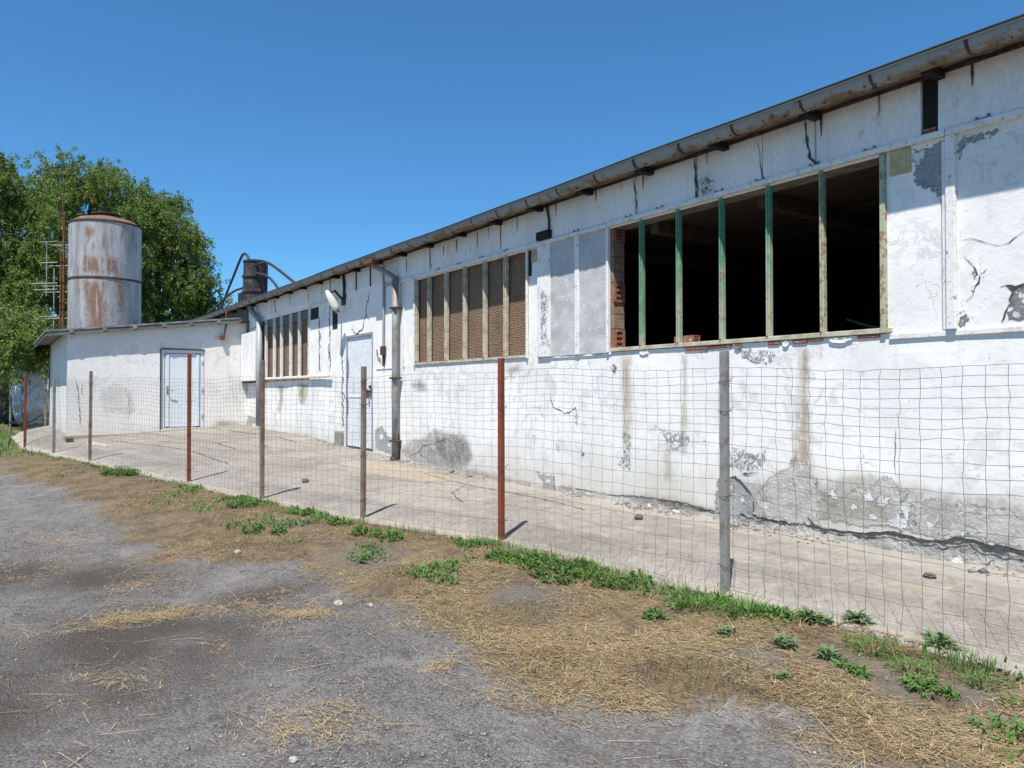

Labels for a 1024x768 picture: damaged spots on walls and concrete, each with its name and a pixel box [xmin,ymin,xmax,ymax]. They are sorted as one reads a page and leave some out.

crack [804,120,817,164]
spalling [912,141,942,206]
spalling [957,128,999,160]
rust [84,257,123,327]
crack [959,228,1024,322]
spalling [1006,286,1024,321]
crack [318,291,370,428]
peeling [655,425,690,450]
leakage [796,398,808,463]
spalling [714,448,1024,550]
crack [730,471,1024,565]